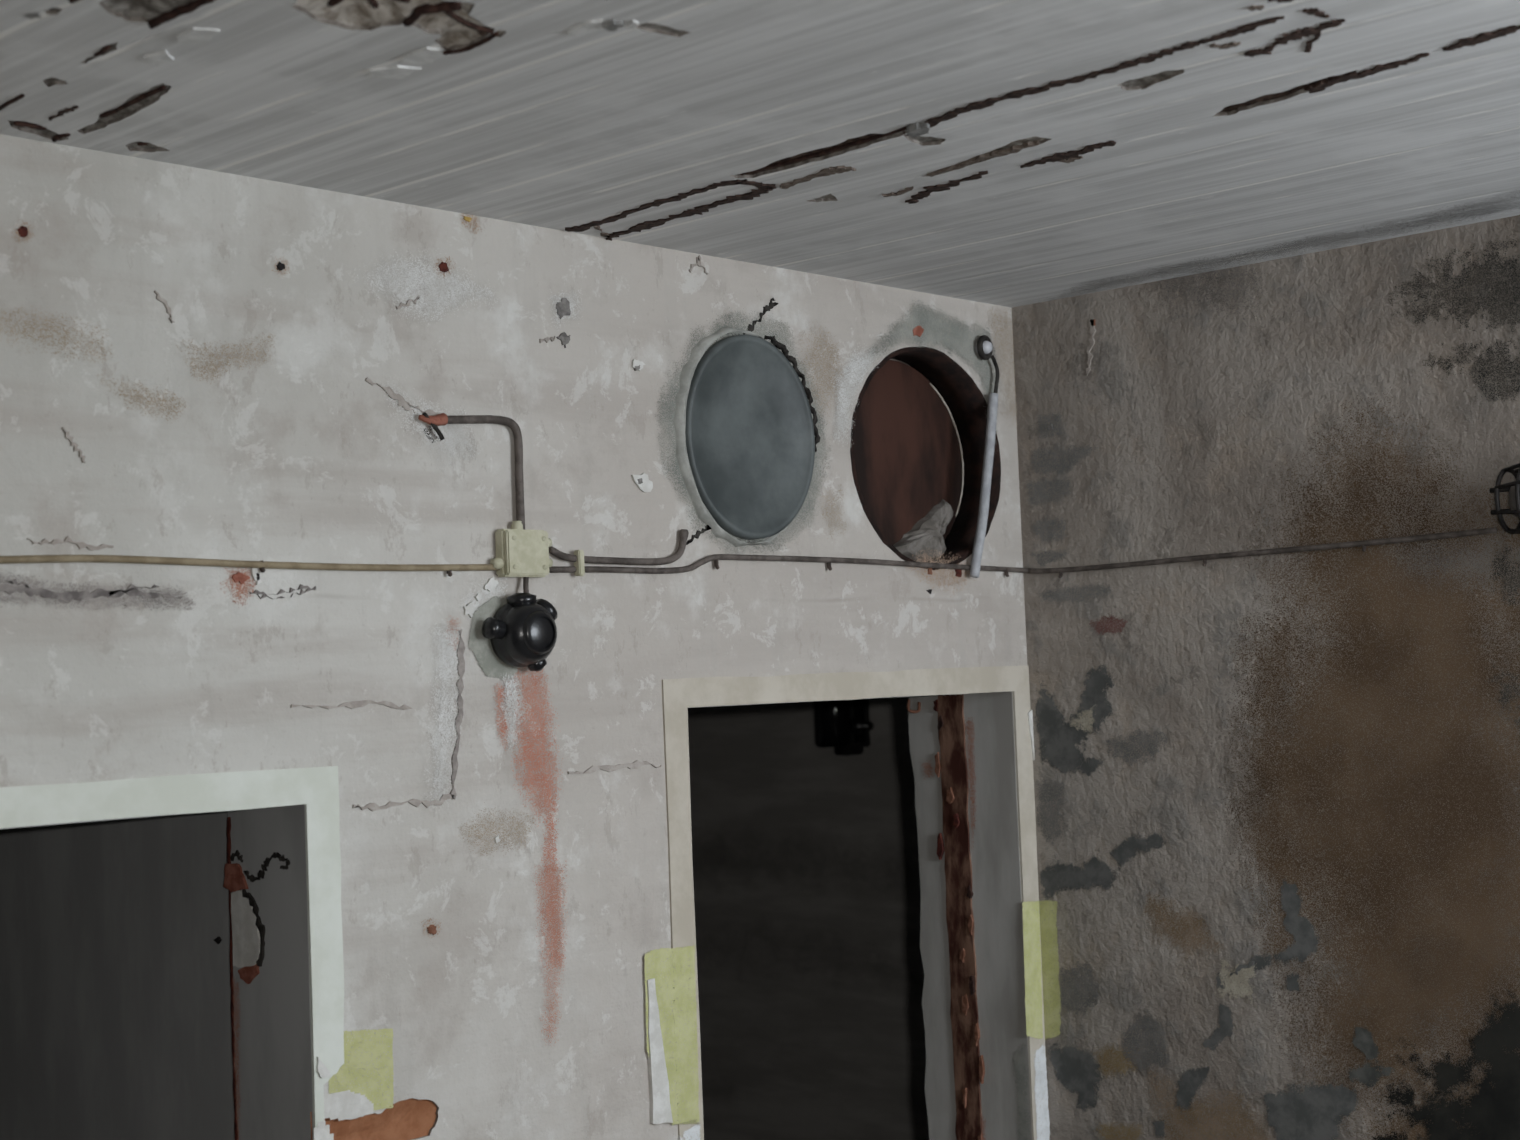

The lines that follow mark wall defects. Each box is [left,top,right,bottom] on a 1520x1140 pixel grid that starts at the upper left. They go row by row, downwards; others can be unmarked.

spalling [295,0,504,79]
crack [565,0,1520,241]
crack [688,255,709,275]
crack [290,621,465,814]
rust [493,666,570,1047]
crack [567,760,661,774]
rust [923,694,987,1140]
peeling [1034,1040,1104,1140]
peeling [1027,664,1171,901]
peeling [1121,878,1320,1139]
peeling [1264,1079,1359,1140]
damp [1211,387,1520,1140]